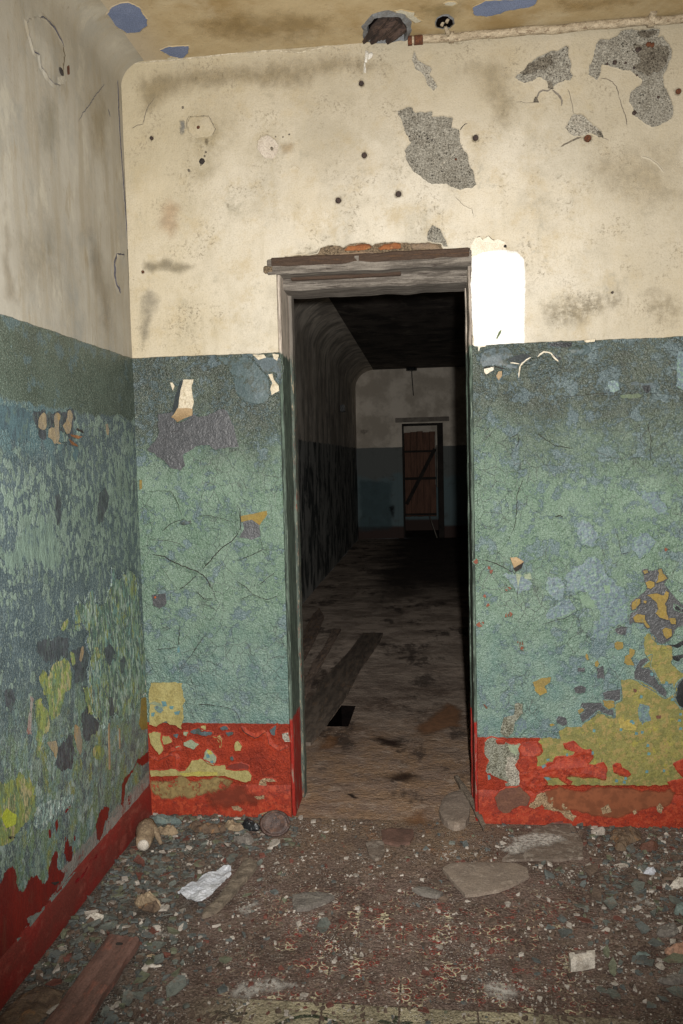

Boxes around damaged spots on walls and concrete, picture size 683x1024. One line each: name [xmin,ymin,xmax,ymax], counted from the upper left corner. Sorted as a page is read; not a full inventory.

peeling [106,1,149,34]
spalling [514,45,609,147]
spalling [587,27,674,128]
spalling [397,106,477,192]
peeling [0,405,83,461]
peeling [146,378,240,472]
crack [149,480,281,603]
crack [156,625,206,673]
peeling [472,518,683,835]
peeling [26,567,280,901]
peeling [268,723,291,743]
peeling [0,772,97,959]